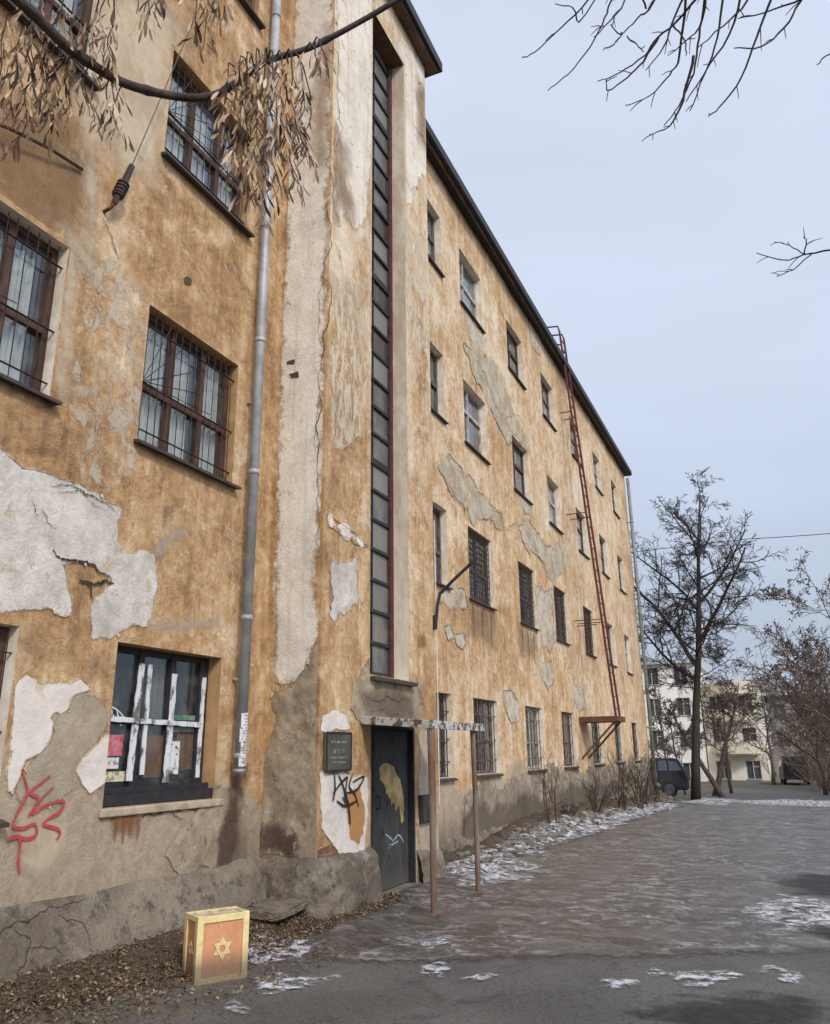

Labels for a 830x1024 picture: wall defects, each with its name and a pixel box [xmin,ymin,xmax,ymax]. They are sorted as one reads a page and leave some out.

crack [314,43,343,548]
peeling [0,250,158,639]
peeling [260,0,434,862]
peeling [433,454,504,531]
peeling [463,308,531,455]
peeling [518,494,568,690]
flaking render [5,675,109,810]
corrosion [114,815,141,843]
damp [217,766,247,867]
damp [261,825,297,858]
crack [0,898,91,977]